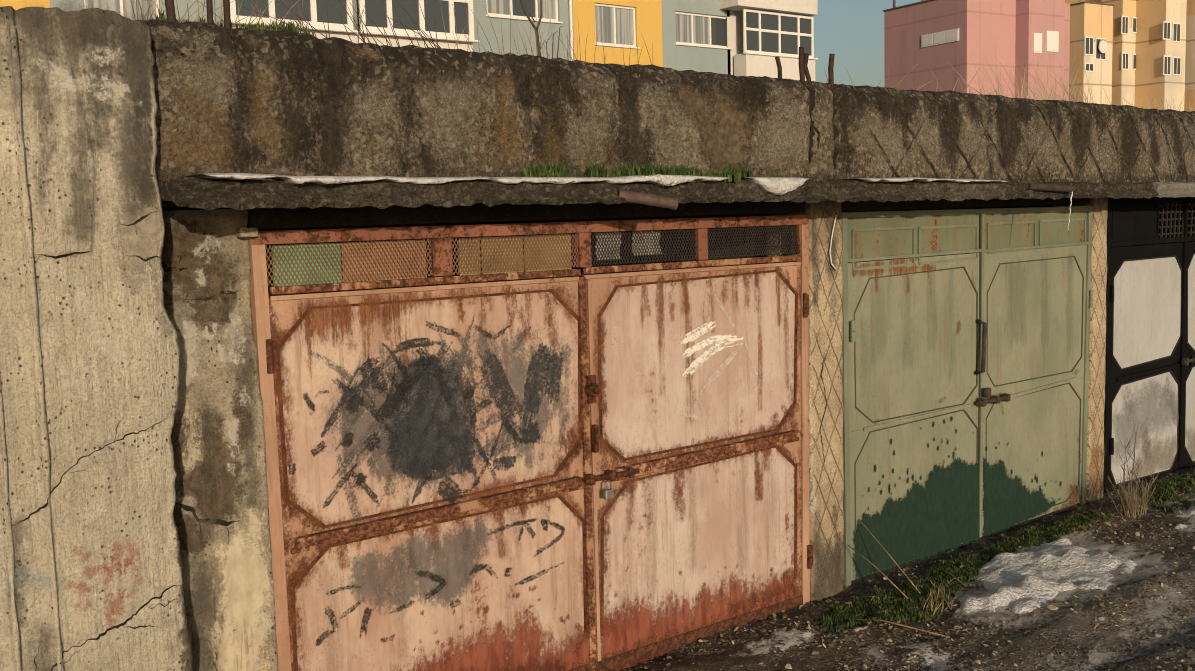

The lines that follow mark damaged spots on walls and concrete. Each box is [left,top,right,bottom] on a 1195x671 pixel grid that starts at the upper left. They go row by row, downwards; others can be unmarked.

crack [803,82,850,169]
damp [834,89,1195,177]
rust [853,234,936,292]
crack [12,415,171,526]
crack [176,502,239,545]
damp [238,339,256,511]
rust [269,292,439,670]
rust [433,267,802,671]
crack [34,585,181,671]
damp [189,562,218,671]